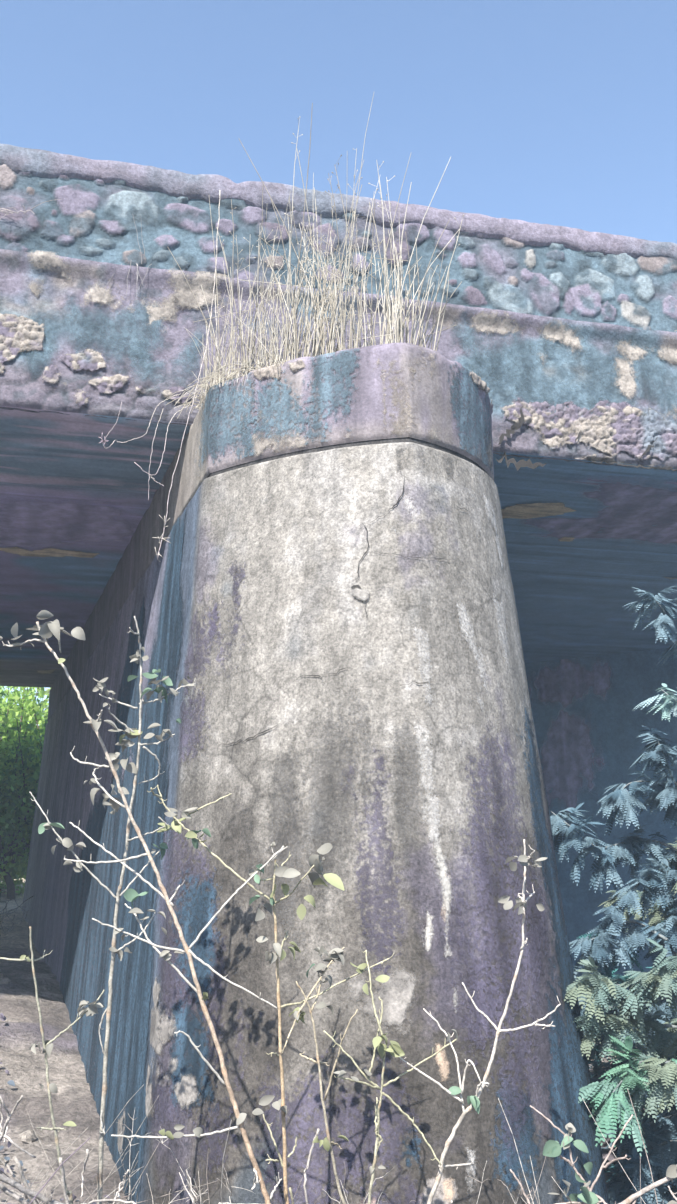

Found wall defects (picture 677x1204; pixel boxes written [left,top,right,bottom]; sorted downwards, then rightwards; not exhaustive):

spalling [0,313,44,373]
flaking render [472,311,581,349]
spalling [42,349,190,407]
damp [195,319,570,475]
spalling [469,341,677,467]
damp [586,352,677,417]
crack [355,474,460,618]